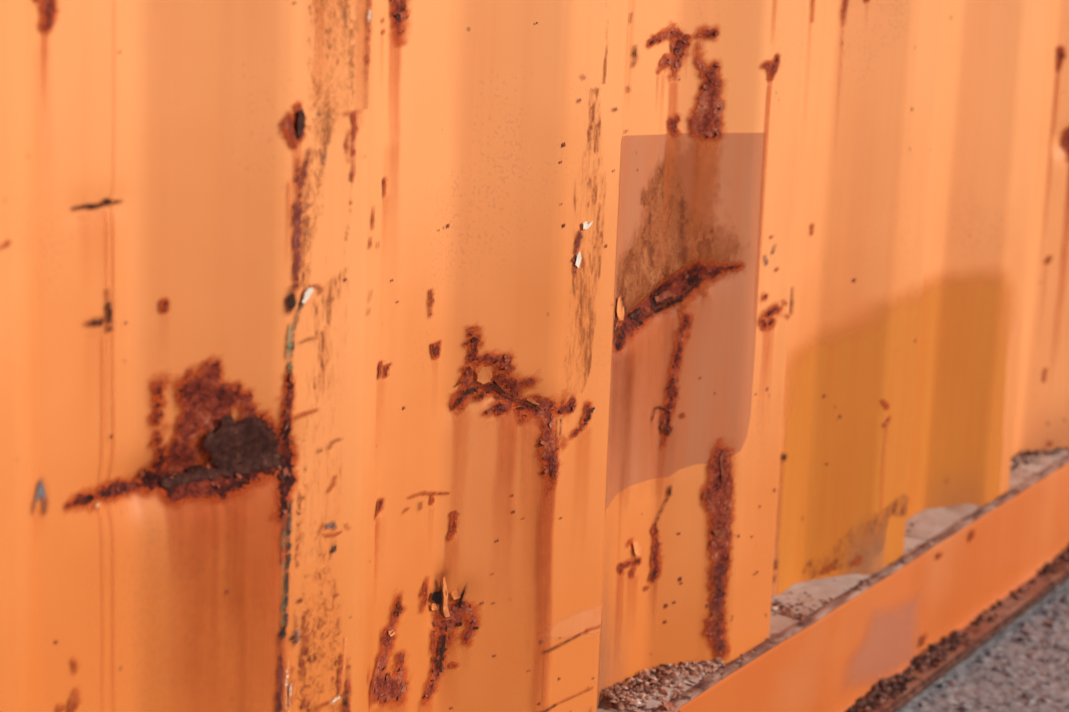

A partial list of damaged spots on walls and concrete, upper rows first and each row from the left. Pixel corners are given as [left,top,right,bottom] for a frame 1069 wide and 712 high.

corrosion [35,0,58,33]
corrosion [383,0,409,45]
corrosion [647,24,725,160]
spalling [613,143,745,394]
corrosion [652,313,694,446]
corrosion [450,326,595,567]
corrosion [447,510,460,540]
corrosion [618,539,642,578]
corrosion [702,439,753,659]